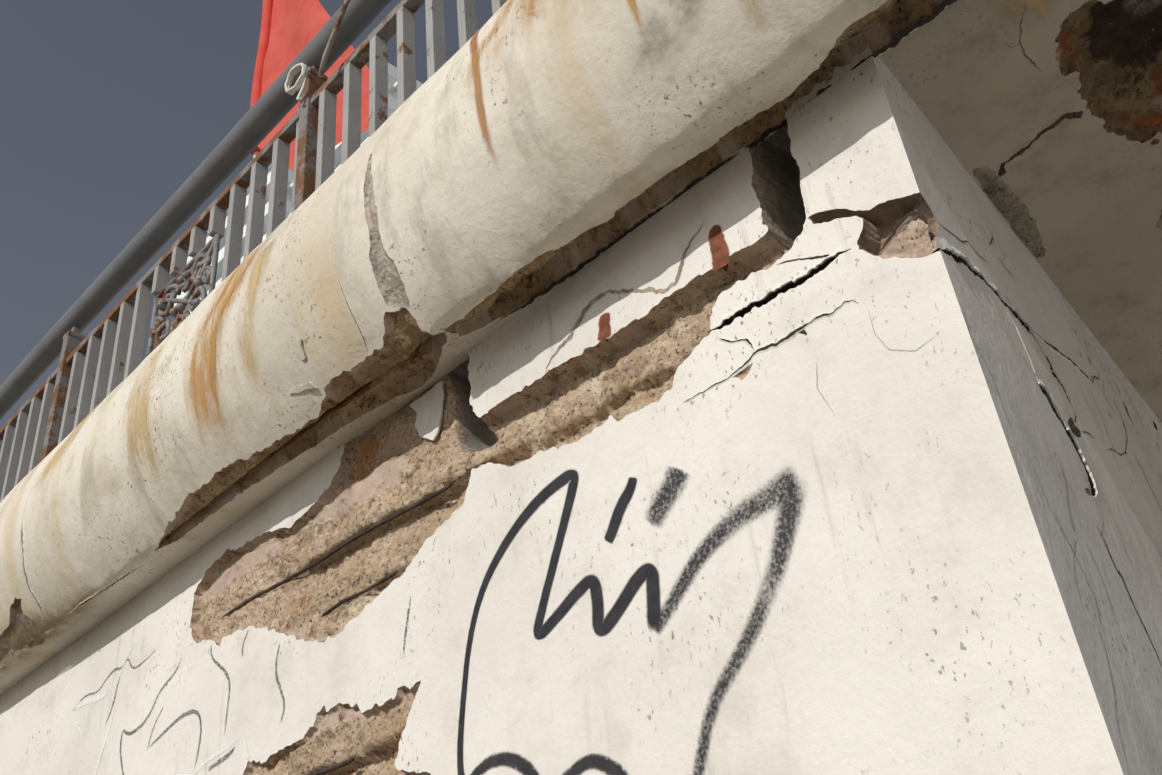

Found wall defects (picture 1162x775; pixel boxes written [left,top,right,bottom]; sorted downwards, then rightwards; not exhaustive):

corrosion [470,26,494,148]
crack [486,0,957,330]
spalling [973,165,1046,258]
crack [995,107,1084,178]
spalling [1055,0,1162,143]
corrosion [191,241,272,417]
spalling [155,0,946,646]
crack [545,219,706,373]
crack [683,242,933,404]
crack [932,224,1162,773]
spalling [0,597,45,663]
spalling [243,681,431,775]